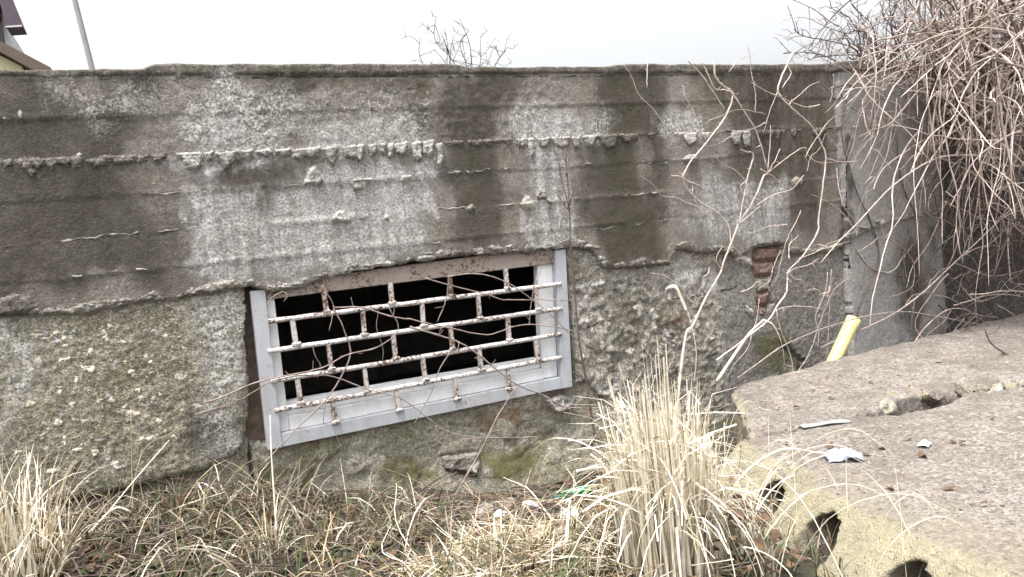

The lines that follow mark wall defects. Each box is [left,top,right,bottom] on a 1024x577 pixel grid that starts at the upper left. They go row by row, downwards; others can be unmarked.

damp [0,68,175,298]
spalling [0,133,654,187]
damp [180,67,719,455]
spalling [234,209,937,452]